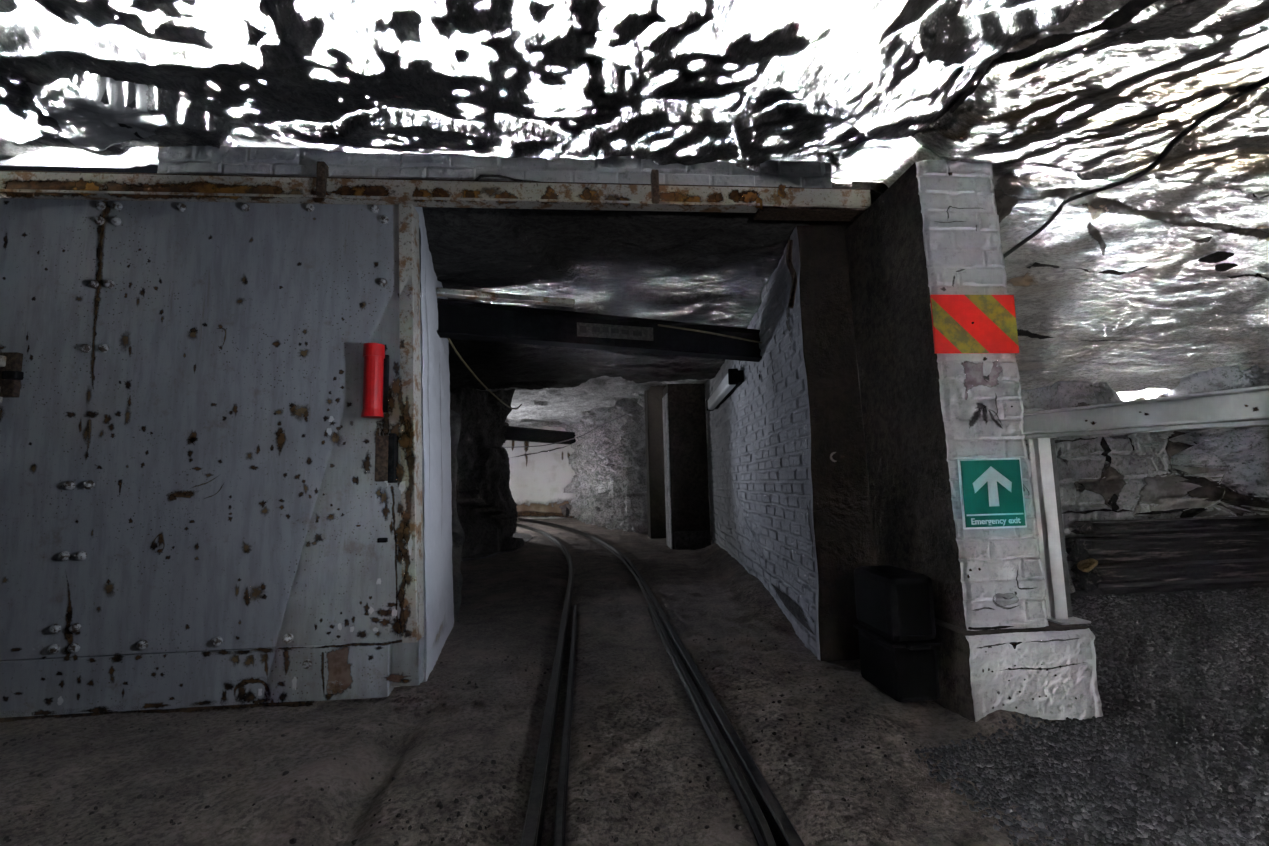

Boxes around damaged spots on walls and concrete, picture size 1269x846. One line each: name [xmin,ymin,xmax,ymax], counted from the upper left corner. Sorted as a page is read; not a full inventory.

corrosion [541,186,559,204]
corrosion [576,188,630,207]
corrosion [659,189,763,210]
corrosion [168,431,232,521]
corrosion [283,457,344,547]
corrosion [0,486,402,723]
corrosion [385,674,411,683]